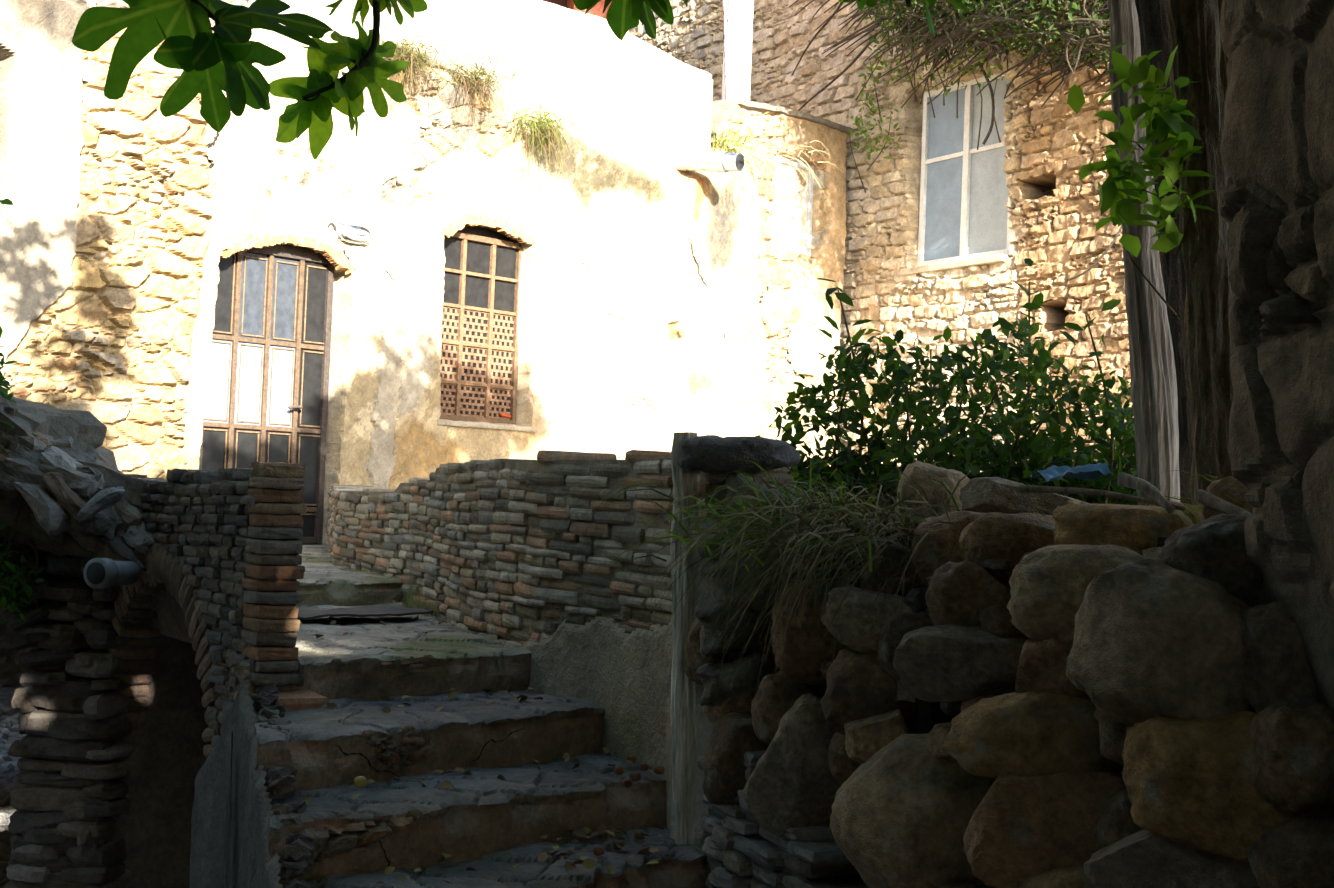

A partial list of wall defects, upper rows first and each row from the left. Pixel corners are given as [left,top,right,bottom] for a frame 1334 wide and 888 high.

spalling [380,55,522,205]
water stain [710,187,738,275]
peeling [723,285,822,437]